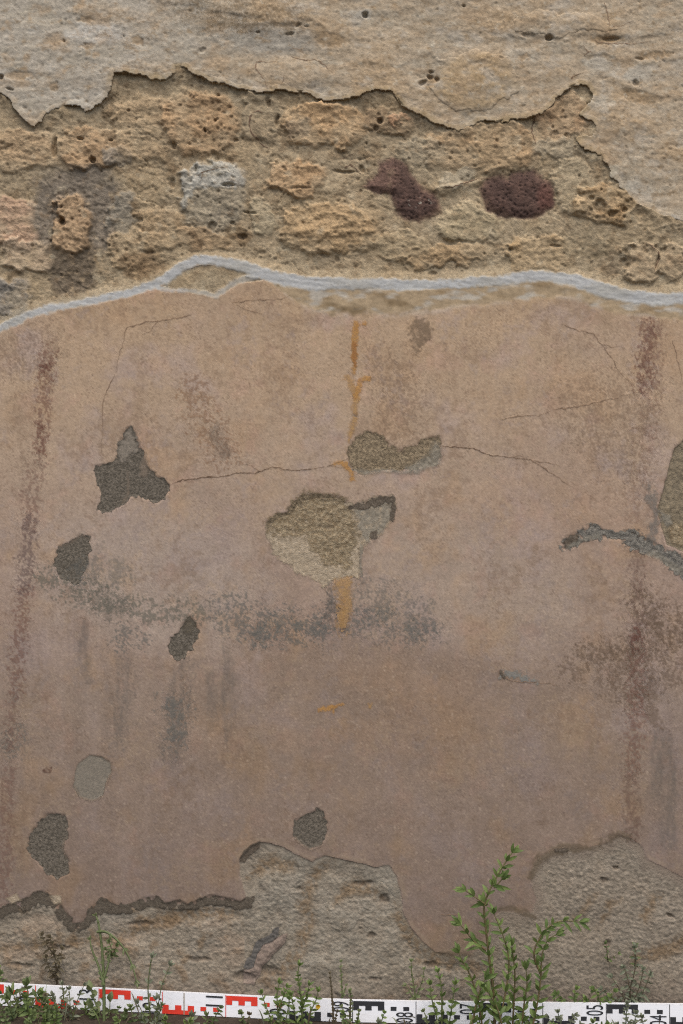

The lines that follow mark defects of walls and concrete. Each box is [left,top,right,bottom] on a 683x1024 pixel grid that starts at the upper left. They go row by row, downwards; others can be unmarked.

flaking render [0,62,683,325]
spalling [334,342,442,480]
spalling [94,425,170,513]
crack [177,460,344,482]
crack [444,446,572,487]
spalling [657,441,683,551]
spalling [53,534,92,584]
spalling [265,490,396,632]
spalling [167,616,200,661]
spalling [27,814,69,880]
spalling [293,807,327,848]
spalling [0,891,255,932]